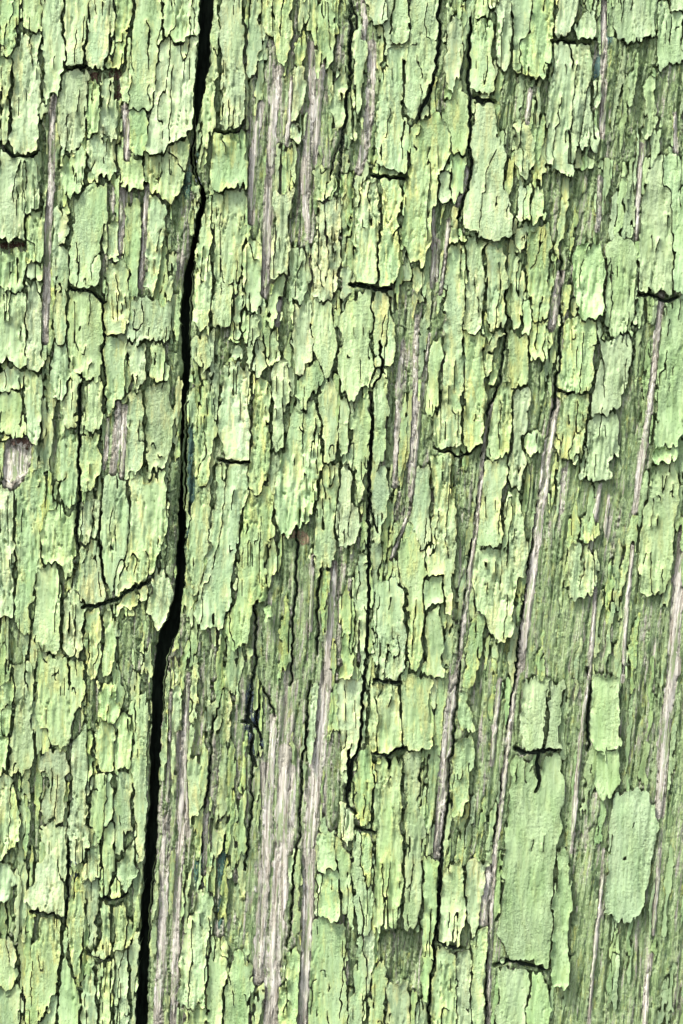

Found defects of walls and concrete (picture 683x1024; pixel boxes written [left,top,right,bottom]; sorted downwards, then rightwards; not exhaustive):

peeling [0,0,200,1024]
crack [101,0,240,1024]
peeling [149,0,683,1024]
crack [492,490,559,842]
crack [547,257,573,437]